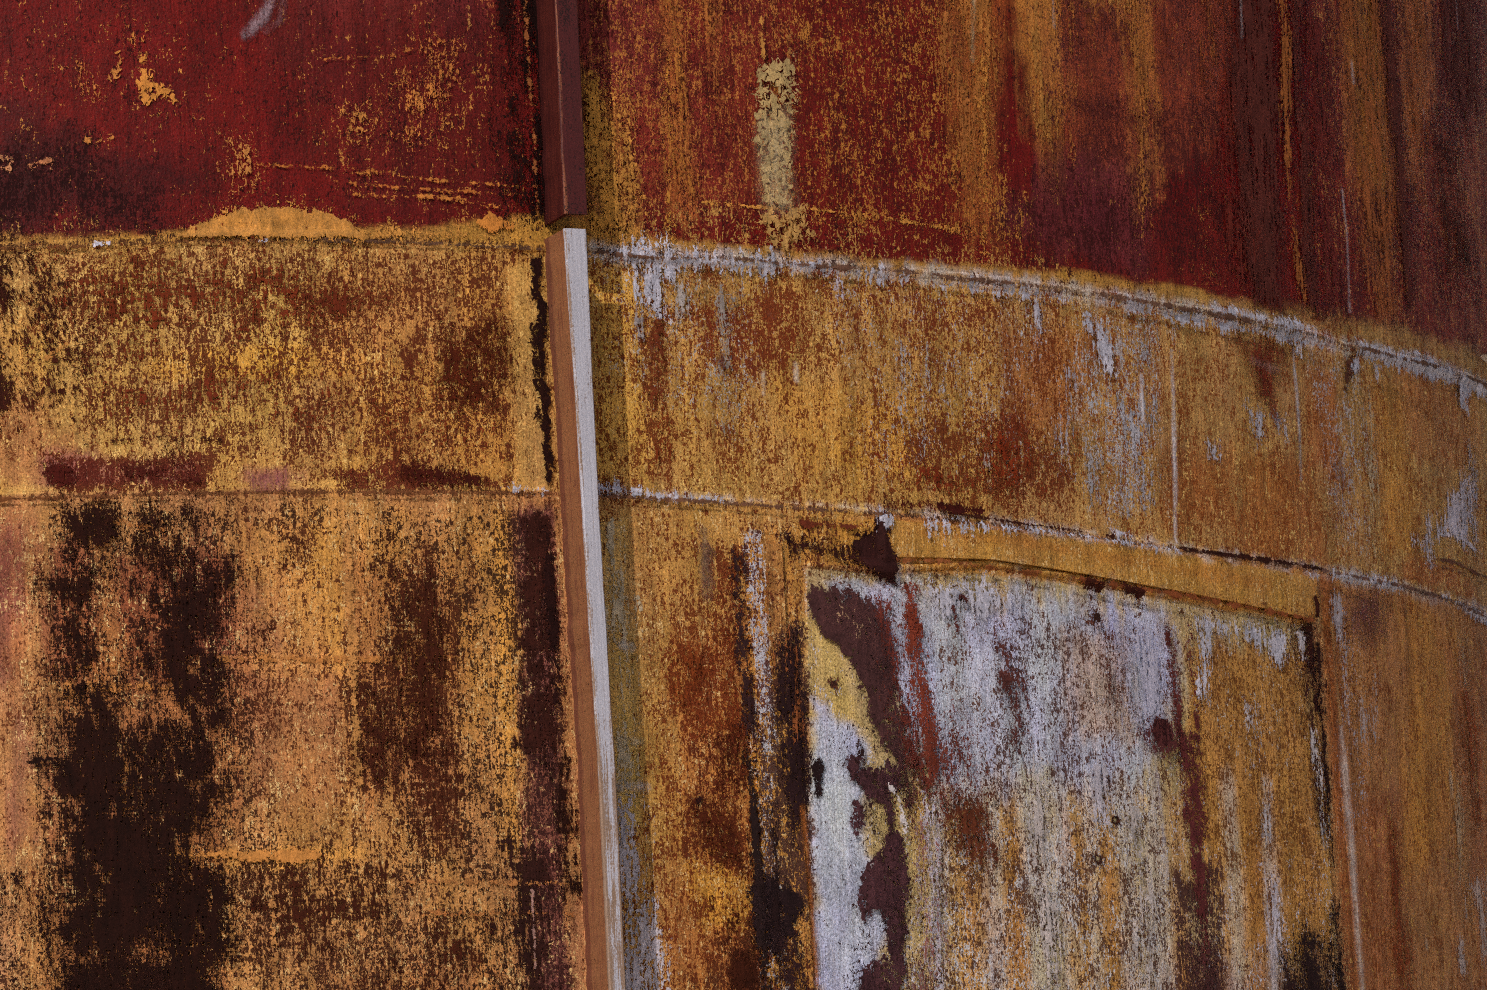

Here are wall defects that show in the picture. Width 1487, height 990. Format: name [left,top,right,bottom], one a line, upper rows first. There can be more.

peeling [749,15,816,252]
corrosion [0,217,583,990]
corrosion [655,530,843,990]
peeling [806,577,957,990]
corrosion [776,408,1350,990]
corrosion [1384,810,1415,990]